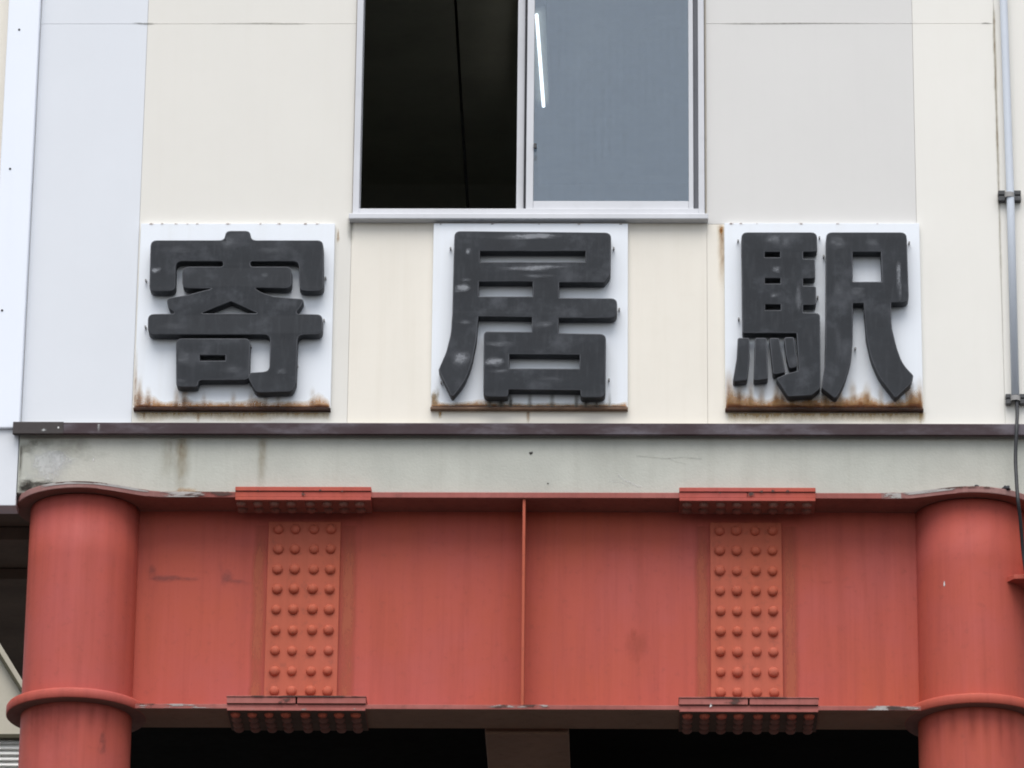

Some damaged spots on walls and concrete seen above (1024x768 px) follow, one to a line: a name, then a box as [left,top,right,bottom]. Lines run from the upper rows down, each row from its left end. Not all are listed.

corrosion [134,396,330,415]
corrosion [431,394,626,416]
corrosion [726,386,923,418]